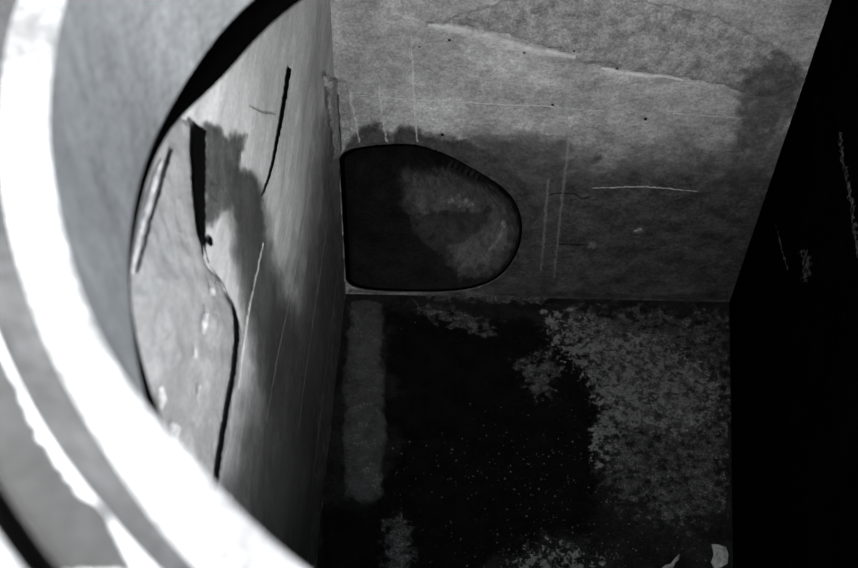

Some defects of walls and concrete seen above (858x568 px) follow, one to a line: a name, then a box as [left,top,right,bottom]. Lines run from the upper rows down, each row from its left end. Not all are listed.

crack [249,67,291,196]
flaking render [133,161,164,273]
flaking render [159,387,167,410]
water stain [204,123,776,568]